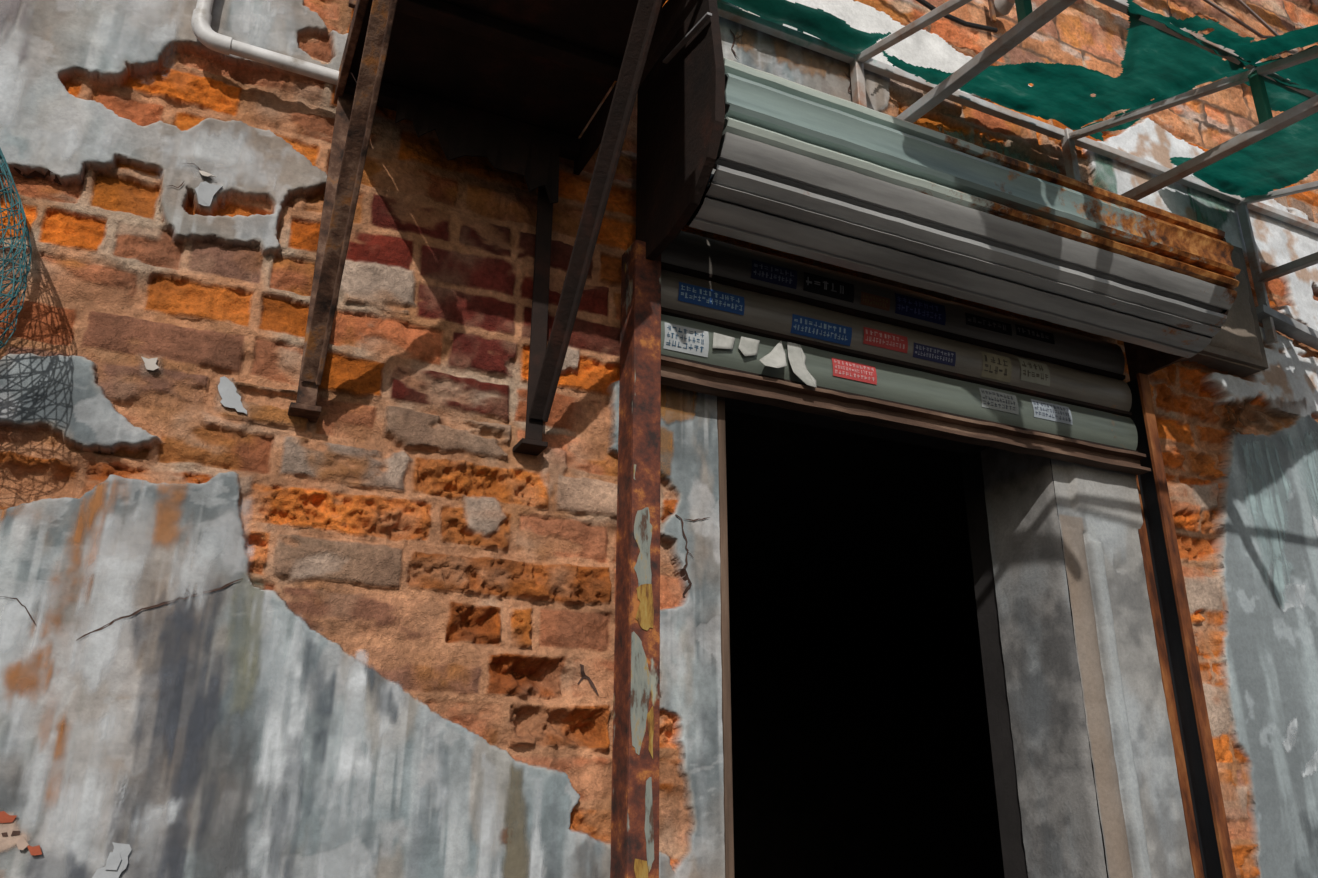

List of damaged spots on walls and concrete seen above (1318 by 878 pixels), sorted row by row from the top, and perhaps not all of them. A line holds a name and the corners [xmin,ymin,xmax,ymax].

flaking render [297,0,354,64]
crack [0,596,36,625]
water stain [80,560,140,684]
crack [76,576,249,641]
water stain [135,598,401,878]
flaking render [0,43,637,843]
flaking render [630,478,695,878]
crack [668,511,710,598]
flaking render [881,79,1318,878]
water stain [1242,433,1318,606]
flaking render [0,811,42,855]
water stain [480,765,542,878]